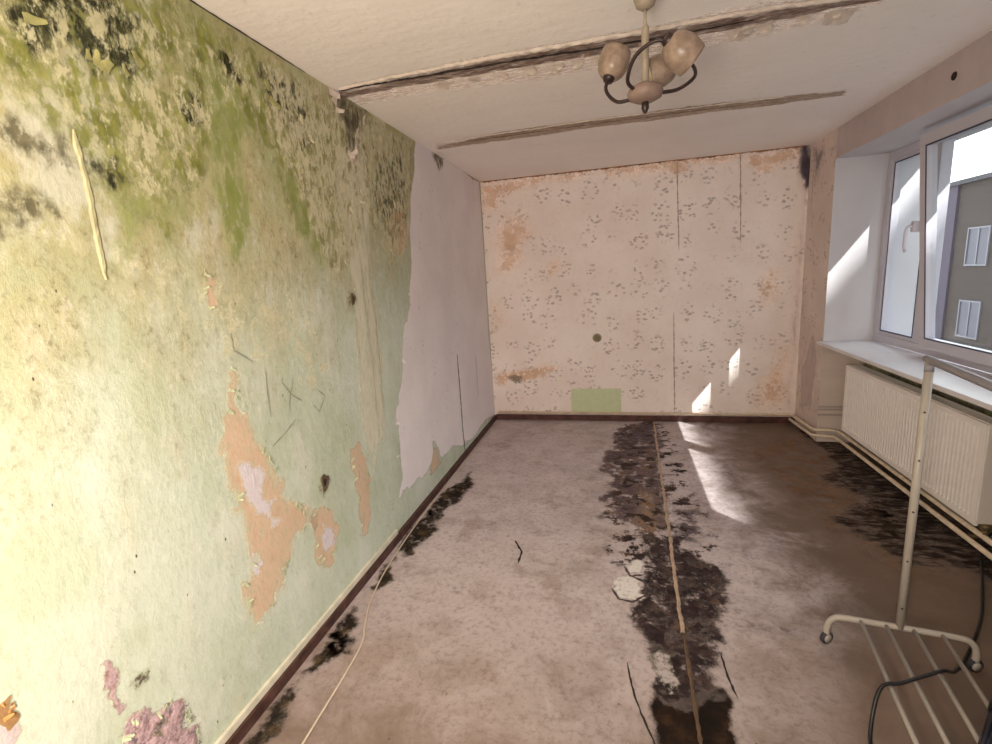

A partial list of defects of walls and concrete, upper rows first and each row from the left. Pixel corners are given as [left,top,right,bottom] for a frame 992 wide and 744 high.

damp [5,0,150,81]
crack [338,0,879,104]
damp [0,187,61,239]
damp [0,116,70,167]
damp [85,156,124,196]
damp [180,46,249,261]
crack [436,91,845,149]
peeling [218,367,339,622]
peeling [350,442,371,536]
damp [599,421,737,744]
peeling [0,695,21,744]
spalling [122,698,201,744]